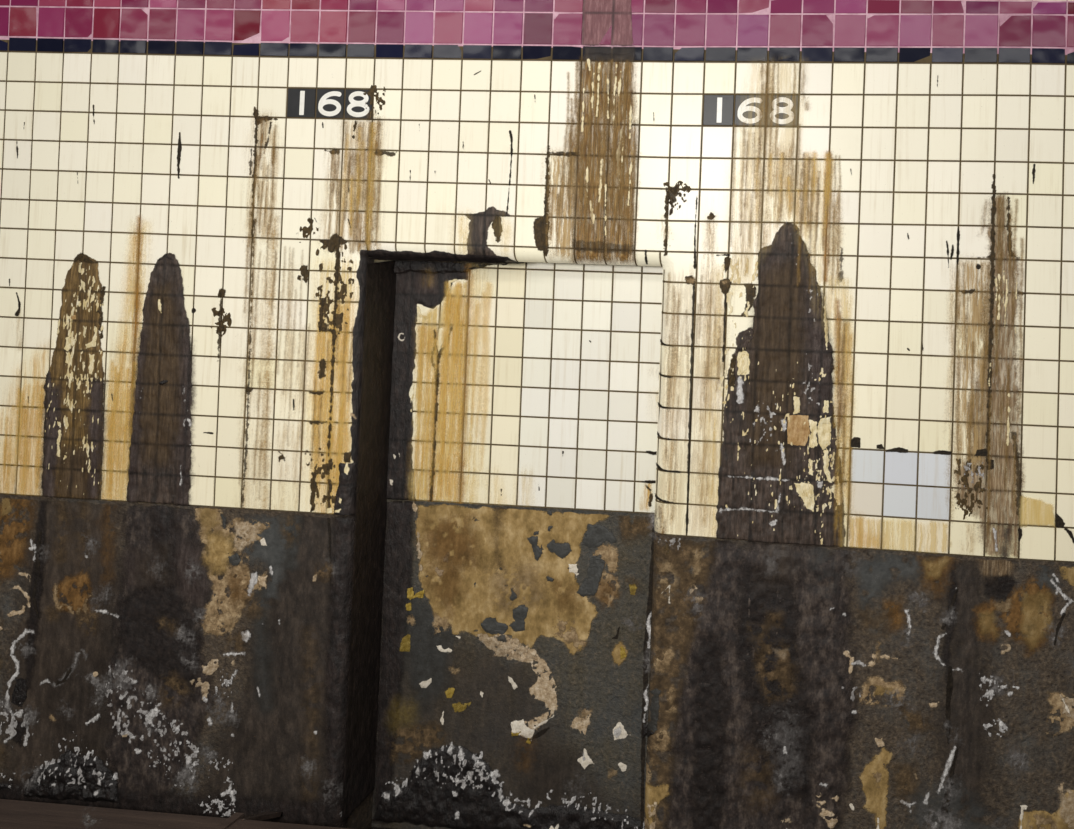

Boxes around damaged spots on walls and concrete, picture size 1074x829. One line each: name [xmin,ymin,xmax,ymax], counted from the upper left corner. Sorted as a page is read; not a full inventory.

rust [241,107,277,506]
leakage [0,249,645,829]
rust [296,85,397,514]
rust [411,206,510,504]
peeling [393,502,712,829]
rust [533,0,636,261]
leakage [659,221,857,829]
rust [761,140,843,281]
peeling [816,738,893,829]
rust [951,174,1026,559]
peeling [1019,782,1074,829]